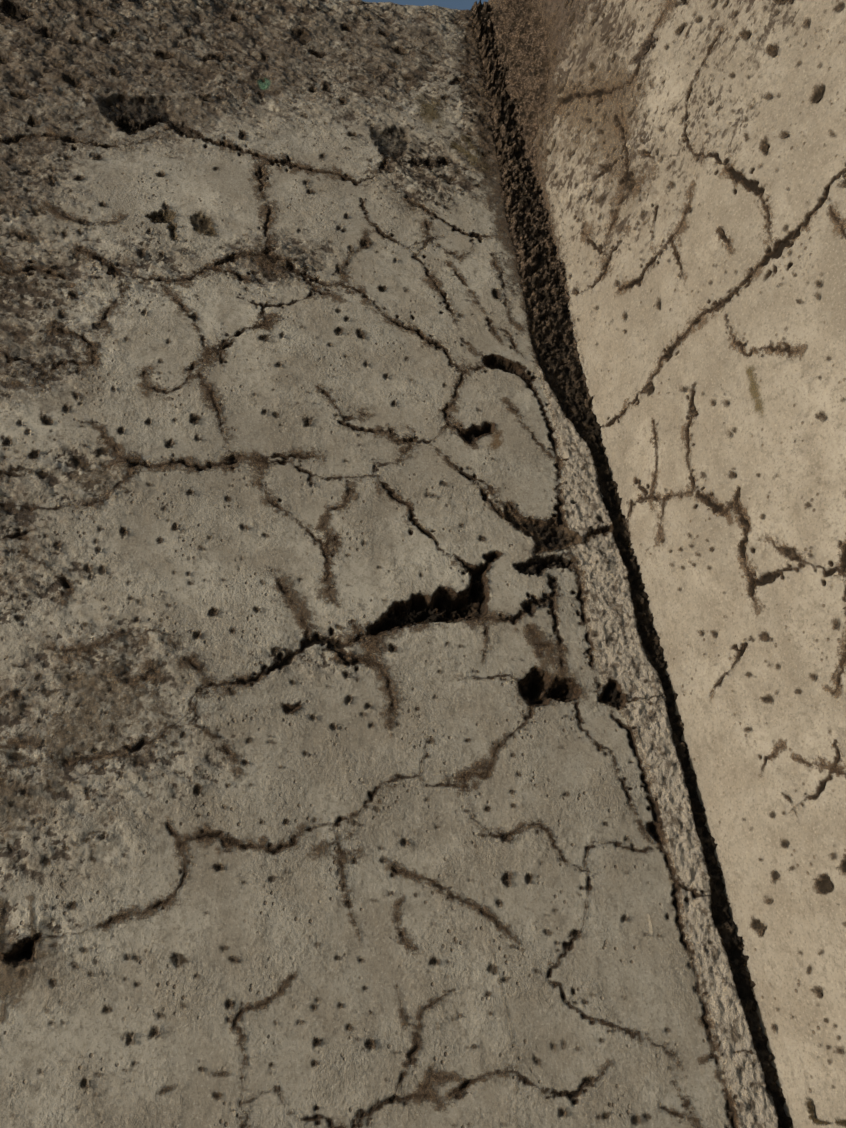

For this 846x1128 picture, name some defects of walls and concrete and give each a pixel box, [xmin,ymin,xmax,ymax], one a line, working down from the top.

spalling [112,114,199,139]
crack [552,0,846,698]
crack [0,125,757,1128]
spalling [367,550,503,652]
spalling [500,502,615,617]
spalling [519,665,582,707]
spalling [599,678,628,710]
crack [758,739,846,814]